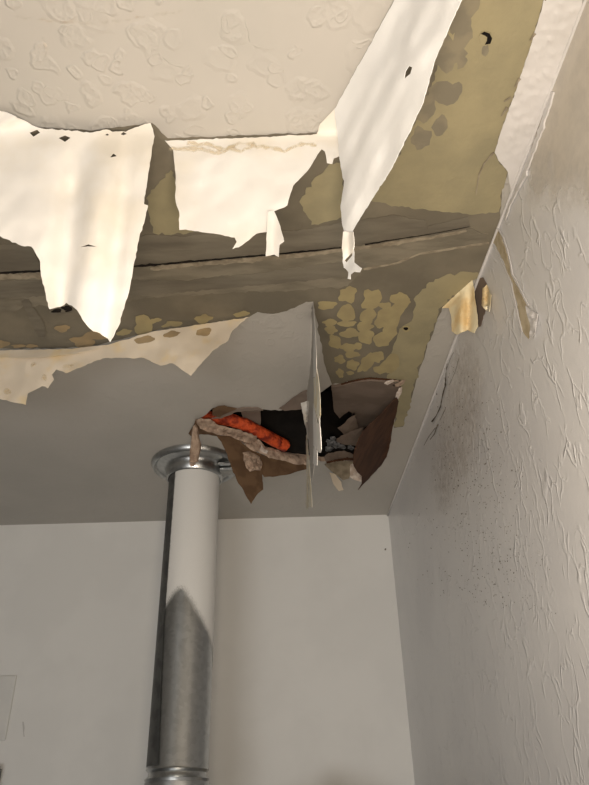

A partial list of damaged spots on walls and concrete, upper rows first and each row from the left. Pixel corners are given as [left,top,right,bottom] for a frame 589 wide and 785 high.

peeling [0,0,546,457]